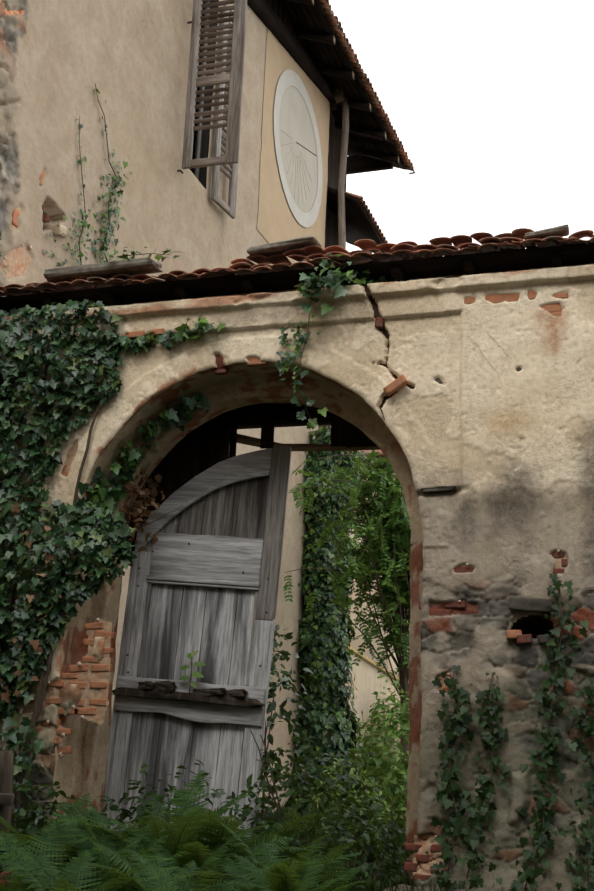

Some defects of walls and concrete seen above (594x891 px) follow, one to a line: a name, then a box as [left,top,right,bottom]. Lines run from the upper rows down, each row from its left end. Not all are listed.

spalling [0,0,25,17]
spalling [42,211,68,237]
spalling [0,244,32,279]
spalling [464,291,568,317]
crack [364,286,415,420]
spalling [454,563,474,573]
spalling [551,550,568,574]
spalling [418,600,478,616]
spalling [506,597,555,644]
peeling [19,618,116,768]
spalling [404,835,444,883]